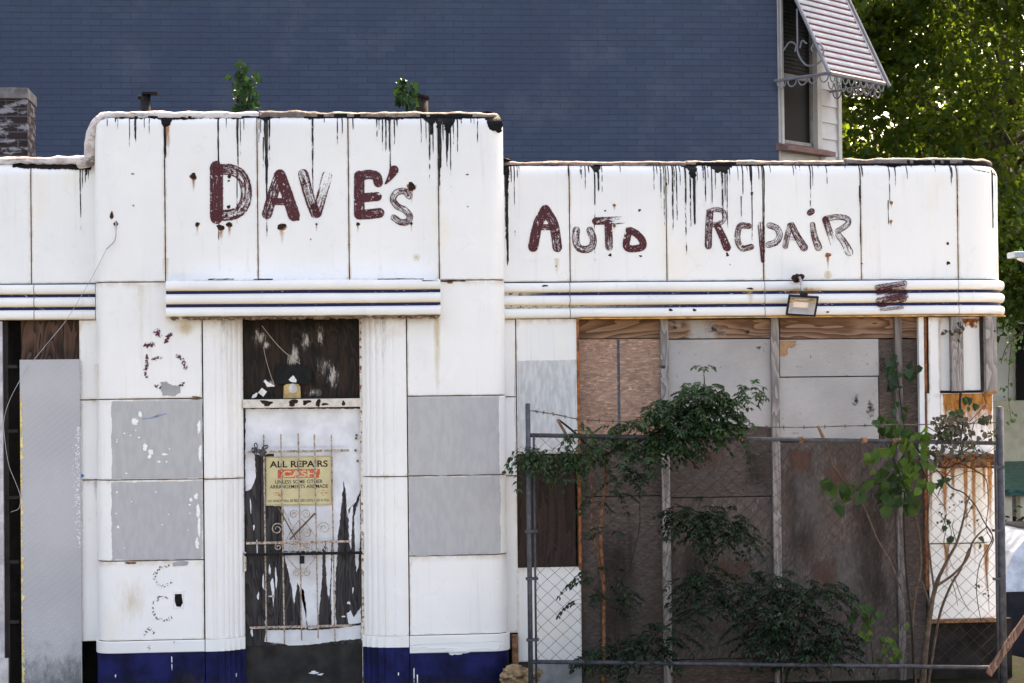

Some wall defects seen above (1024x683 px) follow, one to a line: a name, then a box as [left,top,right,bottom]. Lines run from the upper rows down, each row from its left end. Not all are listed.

water stain [217,118,244,211]
water stain [258,118,270,197]
water stain [311,118,354,186]
water stain [376,119,398,167]
water stain [420,118,478,186]
water stain [504,166,519,266]
water stain [567,166,603,235]
water stain [653,165,771,251]
rust [943,391,996,421]
peeling [244,399,362,646]
rust [929,452,994,533]